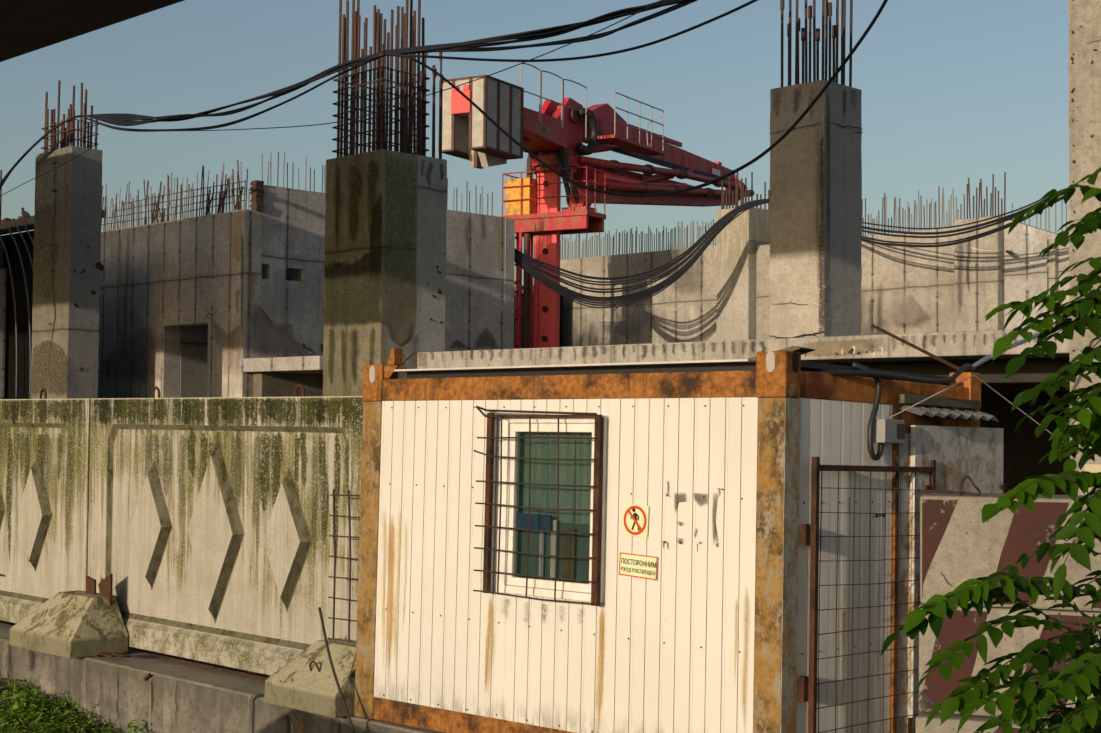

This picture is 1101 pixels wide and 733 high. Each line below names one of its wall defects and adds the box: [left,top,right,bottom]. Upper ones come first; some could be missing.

leakage [336,159,377,242]
leakage [328,329,356,383]
leakage [2,401,80,560]
leakage [94,399,353,555]
corrosion [383,523,406,660]